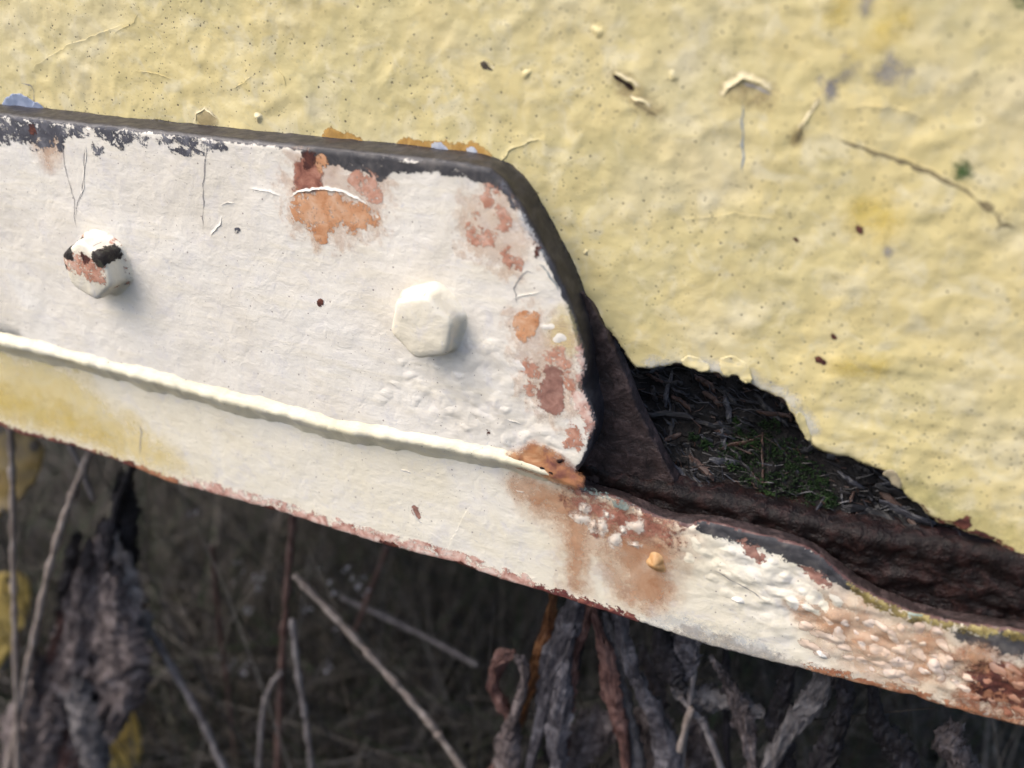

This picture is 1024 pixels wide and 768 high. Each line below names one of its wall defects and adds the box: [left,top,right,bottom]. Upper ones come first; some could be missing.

peeling [0,83,228,157]
corrosion [287,147,383,244]
crack [838,136,1014,231]
corrosion [63,235,130,288]
peeling [681,355,752,383]
peeling [796,412,811,441]
peeling [883,469,902,489]
corrosion [0,421,1024,622]
peeling [696,521,854,590]
corrosion [798,602,1024,726]